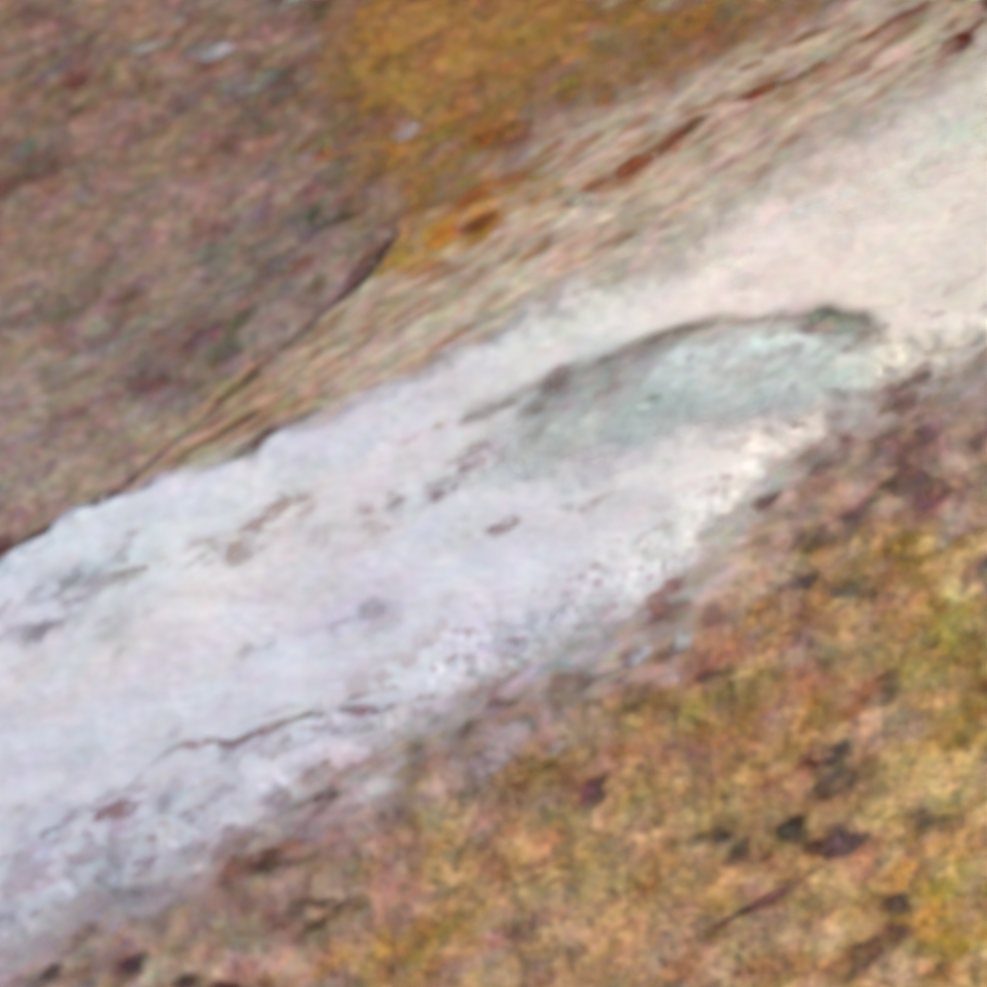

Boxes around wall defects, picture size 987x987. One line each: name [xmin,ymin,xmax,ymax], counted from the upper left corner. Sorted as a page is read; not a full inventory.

leakage [893,108,987,188]
leakage [792,194,836,219]
leakage [837,172,867,200]
leakage [891,192,908,204]
leakage [706,253,736,266]
leakage [268,498,290,513]
leakage [21,532,52,554]
leakage [54,579,76,598]
leakage [76,573,117,601]
leakage [20,622,51,641]
leakage [472,721,531,777]
leakage [106,812,131,867]